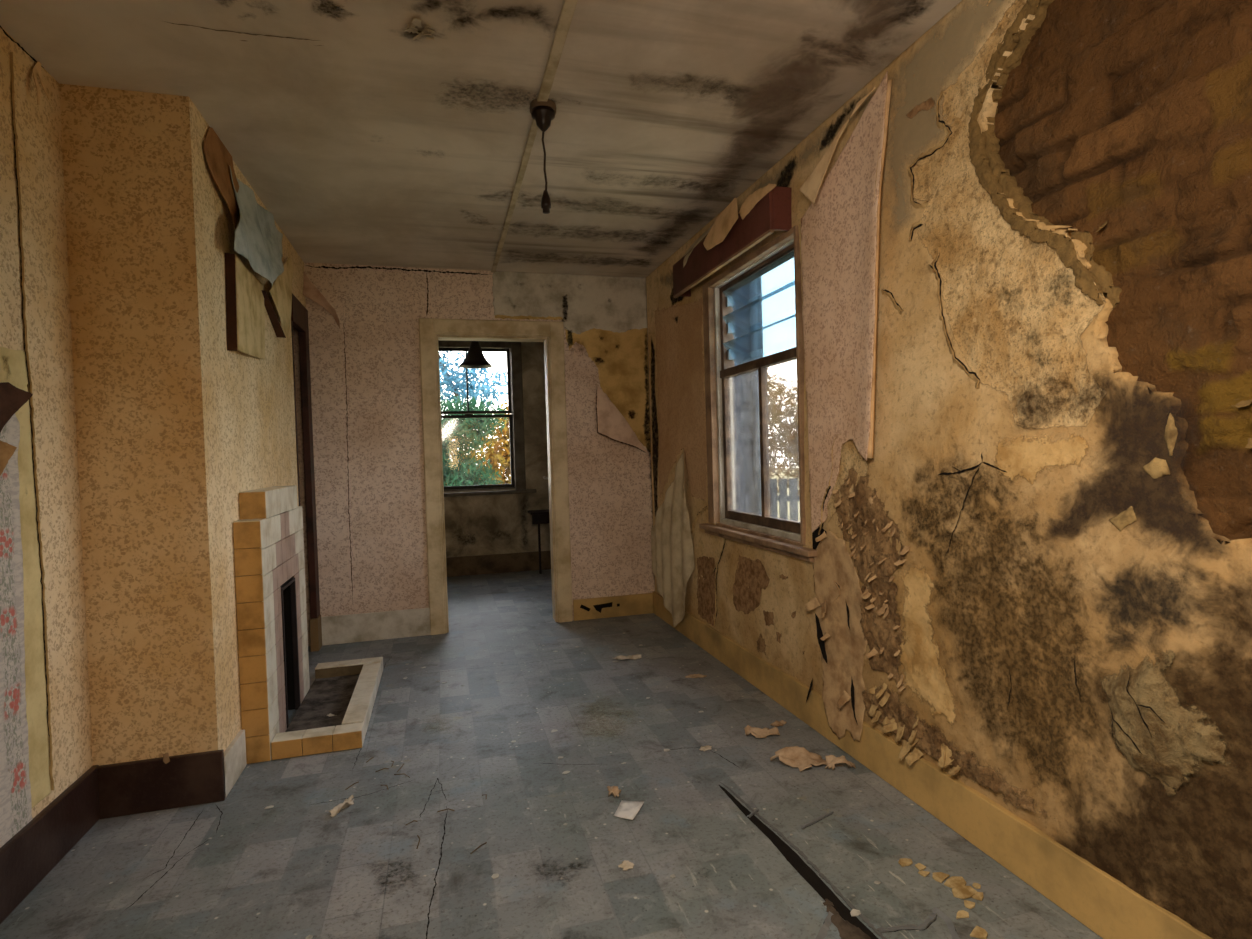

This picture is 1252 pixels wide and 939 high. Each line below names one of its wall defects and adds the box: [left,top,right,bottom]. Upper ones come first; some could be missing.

water stain [313,0,343,18]
water stain [492,7,541,19]
water stain [844,0,924,48]
water stain [677,54,837,194]
water stain [820,101,859,150]
flaking render [492,271,651,451]
water stain [542,210,703,265]
crack [909,219,981,388]
flaking render [906,0,1252,541]
flaking render [812,440,1047,816]
water stain [903,377,1252,939]
crack [426,807,448,939]